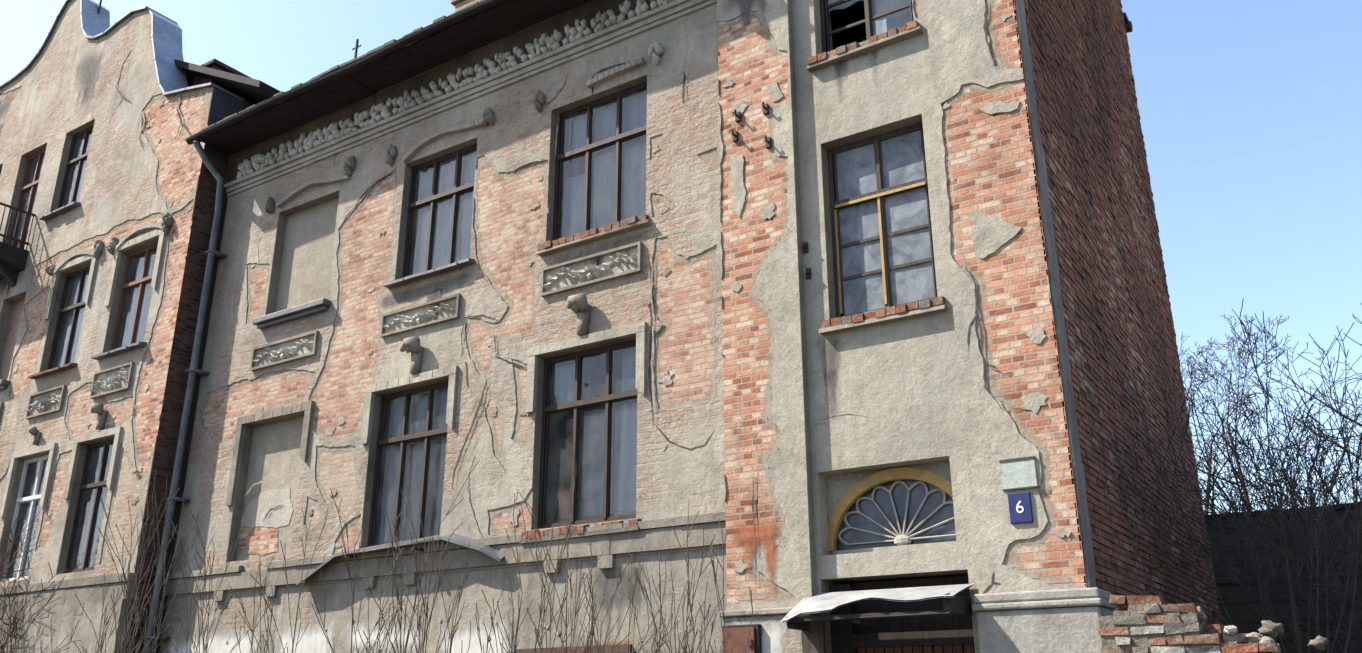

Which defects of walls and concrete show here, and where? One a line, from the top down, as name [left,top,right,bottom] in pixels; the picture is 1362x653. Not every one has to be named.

crack [983,0,996,68]
flaking render [9,90,208,564]
flaking render [200,168,398,555]
crack [452,314,527,538]
flaking render [465,155,549,471]
flaking render [488,488,533,537]
crack [648,251,715,452]
flaking render [649,11,795,603]
peeling [761,623,785,653]
crack [966,268,1004,411]
crack [982,572,1000,594]
flaking render [941,0,1087,586]